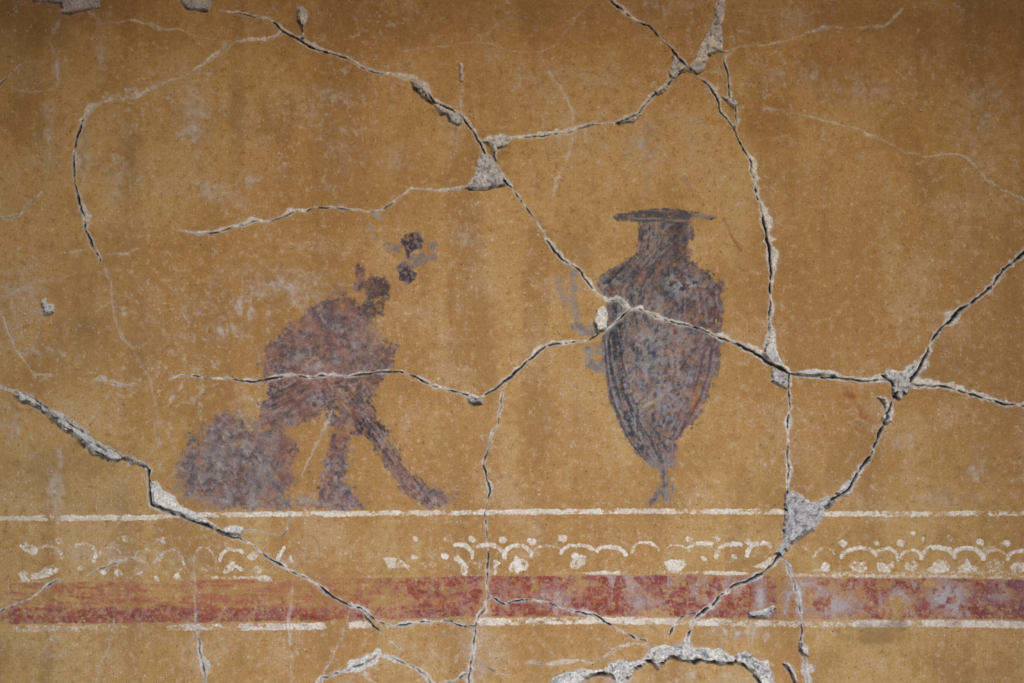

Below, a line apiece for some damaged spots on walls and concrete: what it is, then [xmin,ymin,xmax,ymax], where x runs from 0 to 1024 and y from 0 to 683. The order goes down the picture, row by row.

crack [714,0,910,98]
flaking render [464,137,511,191]
crack [57,0,780,683]
crack [910,246,1024,410]
flaking render [12,391,149,468]
crack [782,365,890,501]
flaking render [150,480,245,537]
flaking render [773,479,852,558]
crack [0,551,167,614]
crack [667,555,805,642]
flaking render [550,641,799,683]
crack [799,656,815,683]